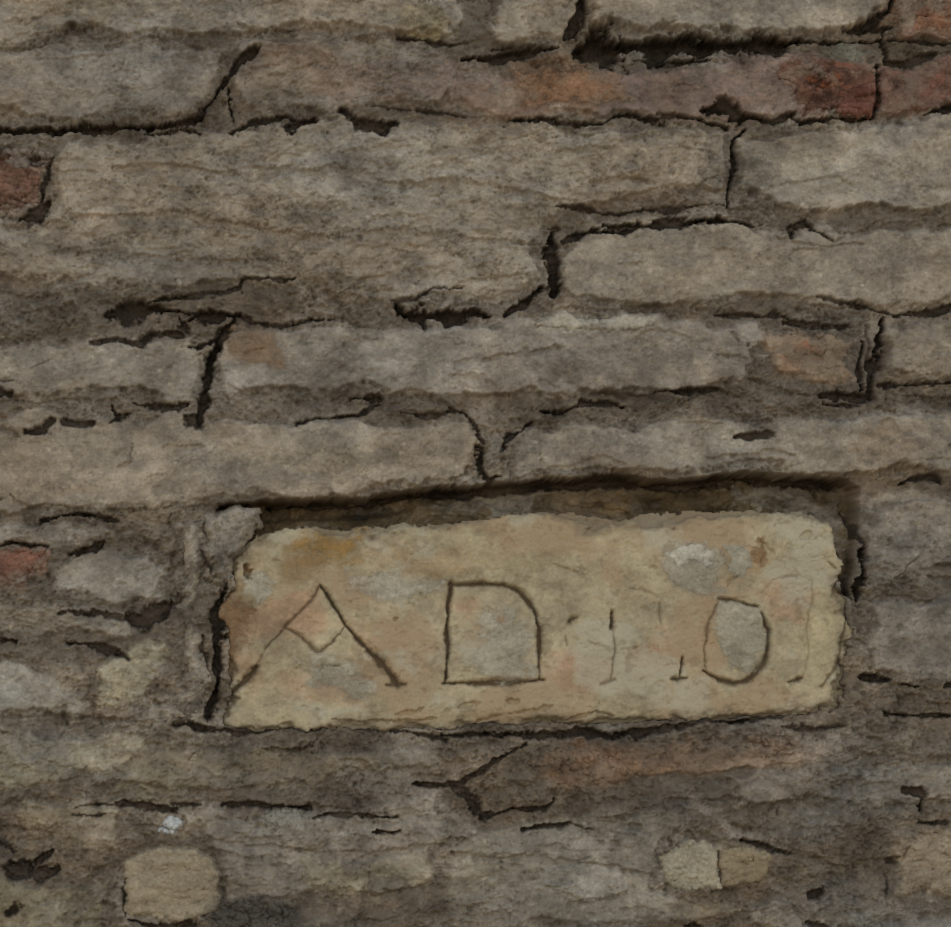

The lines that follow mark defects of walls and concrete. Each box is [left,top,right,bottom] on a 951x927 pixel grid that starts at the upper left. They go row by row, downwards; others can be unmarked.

crack [24,277,329,435]
crack [265,393,833,512]
crack [838,513,865,602]
crack [365,715,846,831]